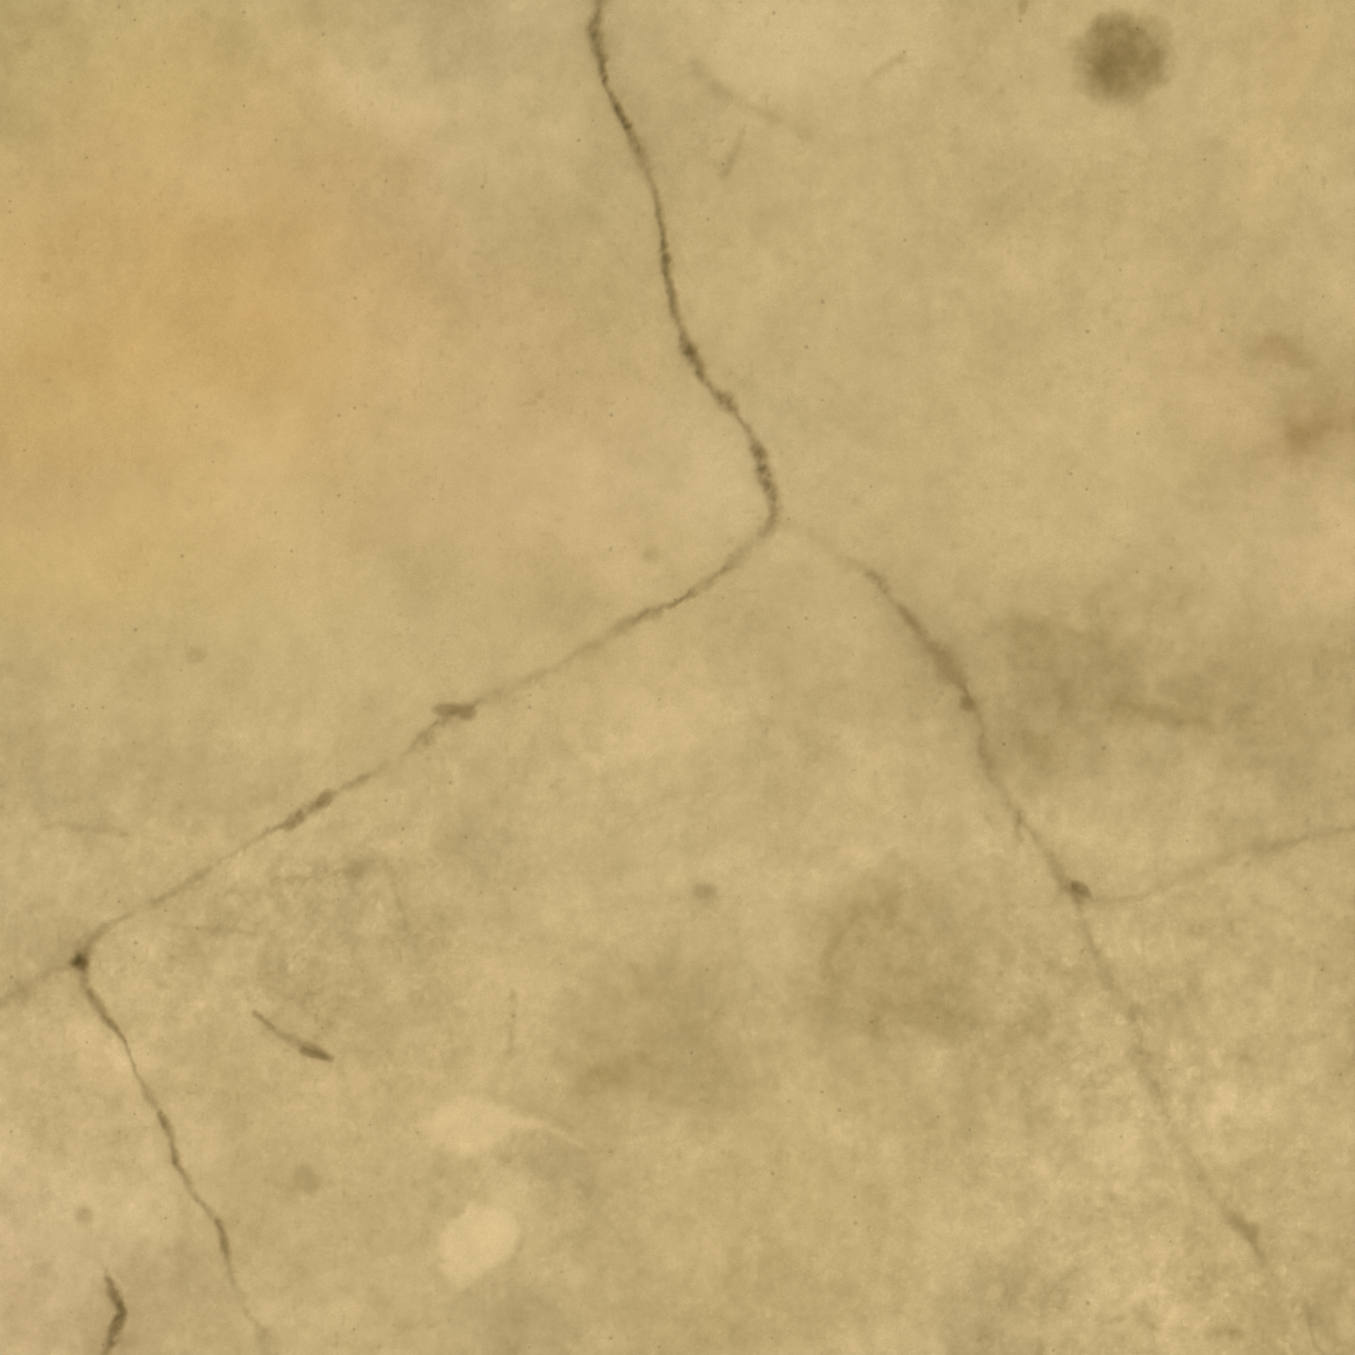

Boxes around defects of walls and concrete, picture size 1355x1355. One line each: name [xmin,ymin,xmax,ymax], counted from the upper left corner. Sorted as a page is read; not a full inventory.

crack [857,47,911,90]
leakage [1059,0,1186,113]
crack [0,0,818,1355]
crack [773,509,1355,1355]